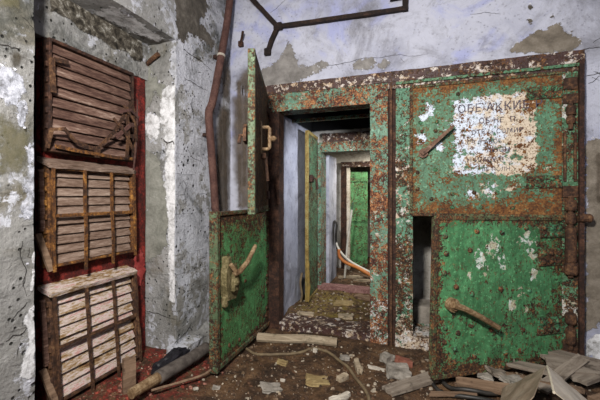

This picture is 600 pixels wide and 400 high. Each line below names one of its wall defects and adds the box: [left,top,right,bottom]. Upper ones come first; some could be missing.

peeling [510,15,582,54]
peeling [261,40,329,86]